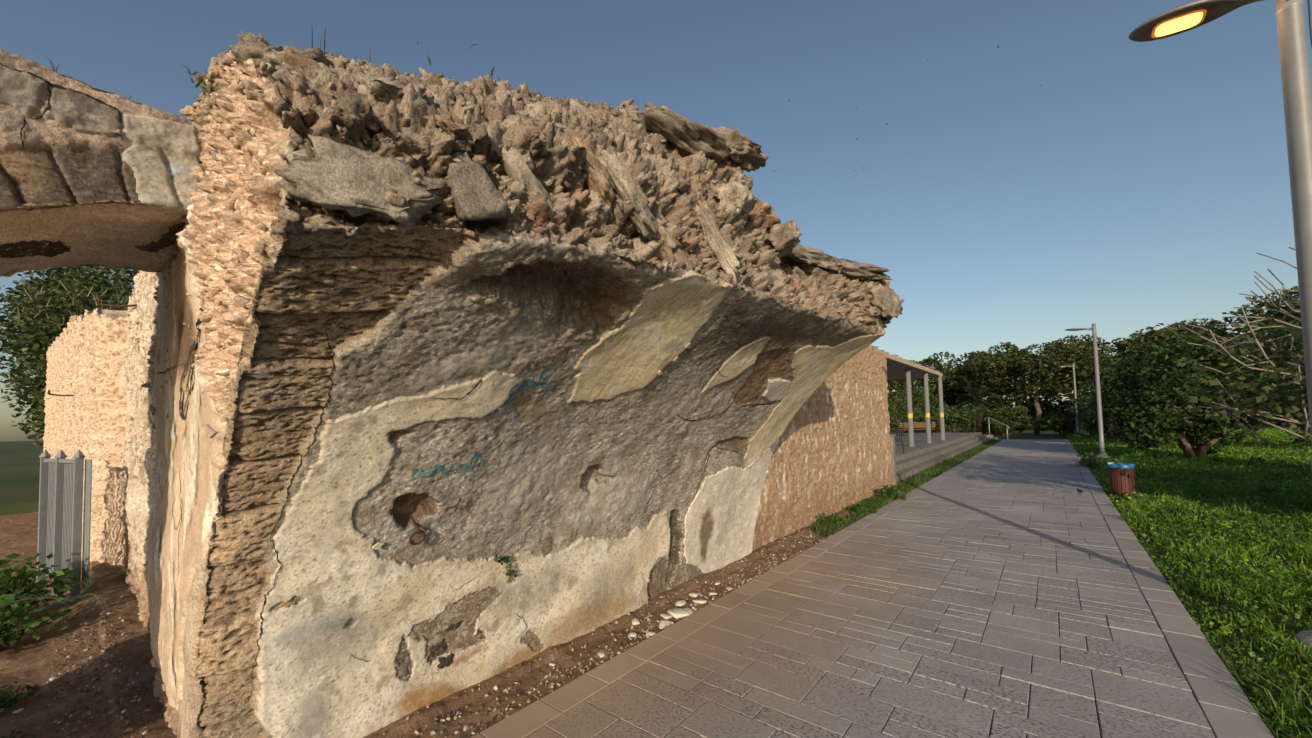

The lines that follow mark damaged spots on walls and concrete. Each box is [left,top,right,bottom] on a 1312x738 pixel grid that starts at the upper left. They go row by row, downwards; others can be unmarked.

flaking render [0,64,231,711]
leakage [126,191,211,692]
crack [156,274,204,380]
crack [247,320,335,710]
flaking render [254,330,885,738]
flaking render [470,260,734,403]